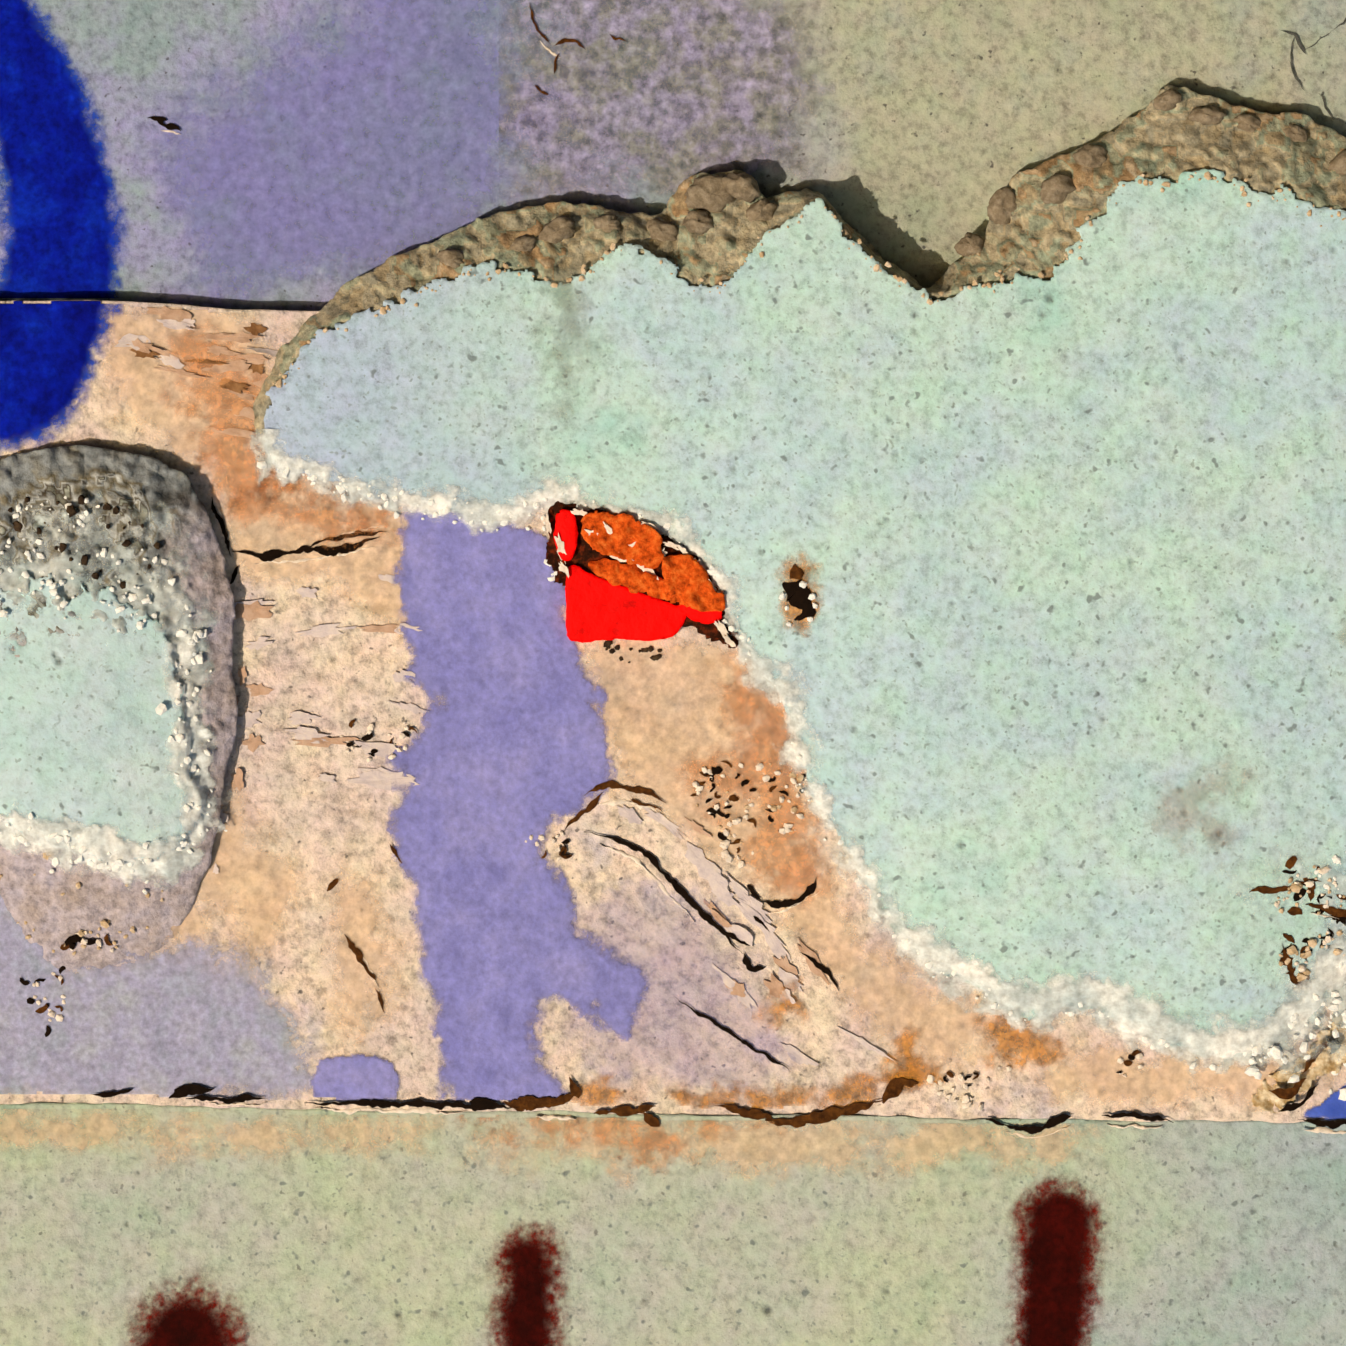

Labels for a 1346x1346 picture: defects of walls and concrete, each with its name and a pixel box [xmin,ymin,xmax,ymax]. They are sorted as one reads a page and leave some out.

spalling [114,85,1346,1113]
spalling [0,445,274,1037]
crack [563,780,822,972]
crack [800,952,839,991]
crack [679,1001,789,1070]
crack [92,1088,133,1098]
crack [169,1084,270,1107]
crack [307,1077,660,1127]
crack [714,1077,919,1128]
crack [986,1112,1174,1138]
crack [1298,1119,1346,1134]